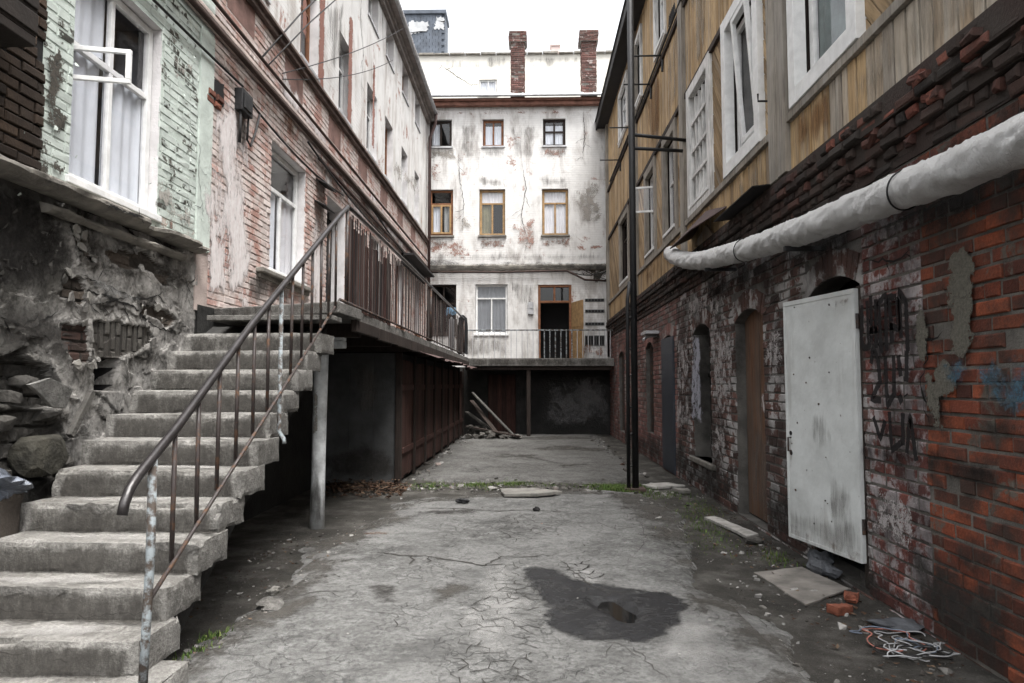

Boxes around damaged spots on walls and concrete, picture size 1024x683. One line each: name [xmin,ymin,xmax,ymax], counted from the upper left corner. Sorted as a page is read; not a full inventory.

peeling [38,33,79,175]
spalling [207,79,224,111]
spalling [59,223,182,370]
crack [512,164,528,250]
spalling [505,218,606,282]
crack [383,503,648,683]
crack [589,638,668,680]
water stain [524,567,816,683]